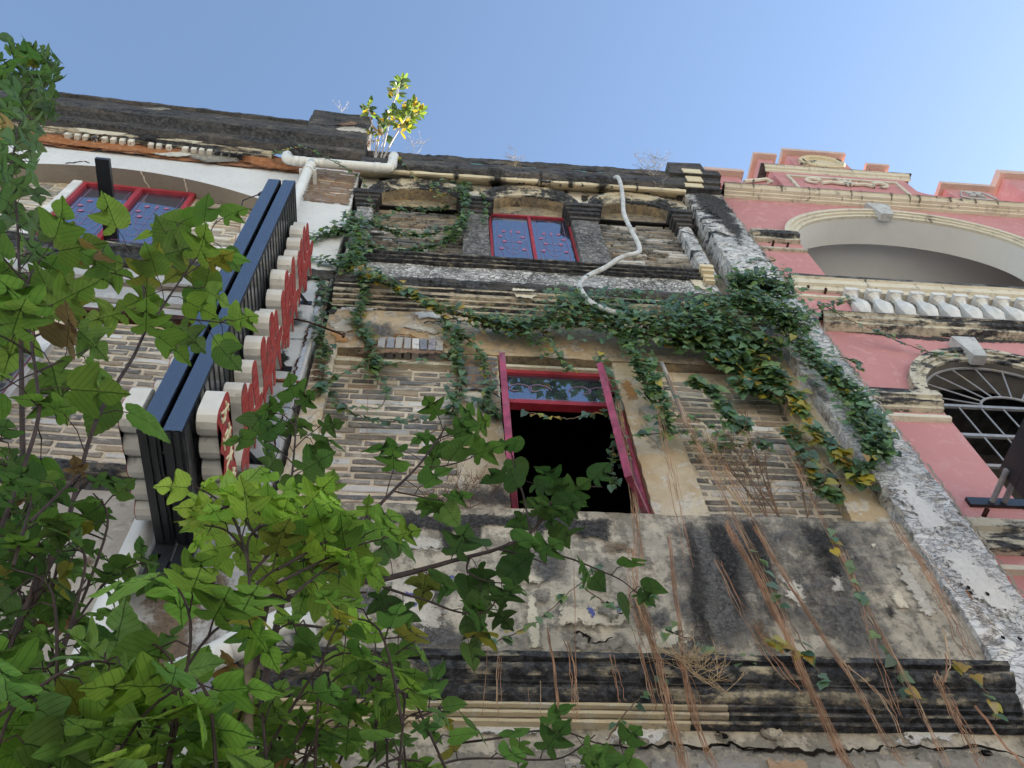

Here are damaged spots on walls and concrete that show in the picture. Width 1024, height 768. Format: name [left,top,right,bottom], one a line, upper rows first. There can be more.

spalling [32,128,202,157]
spalling [236,155,299,171]
water stain [694,192,749,242]
peeling [721,195,1024,633]
peeling [402,535,444,552]
peeling [385,571,456,635]
peeling [521,568,627,653]
peeling [649,617,691,653]
water stain [649,514,902,657]